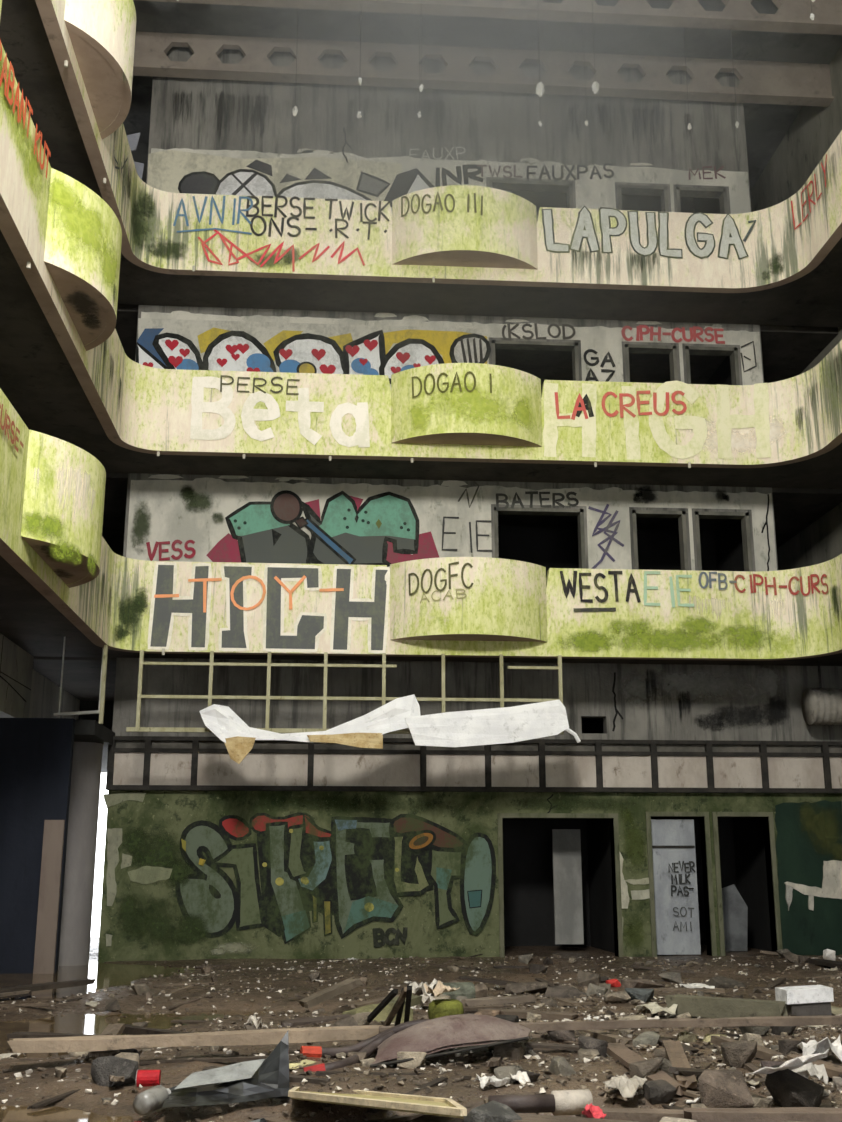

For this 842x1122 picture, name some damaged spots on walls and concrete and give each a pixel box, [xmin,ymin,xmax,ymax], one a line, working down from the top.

water stain [764,255,783,279]
water stain [679,691,787,730]
peeling [785,860,842,911]